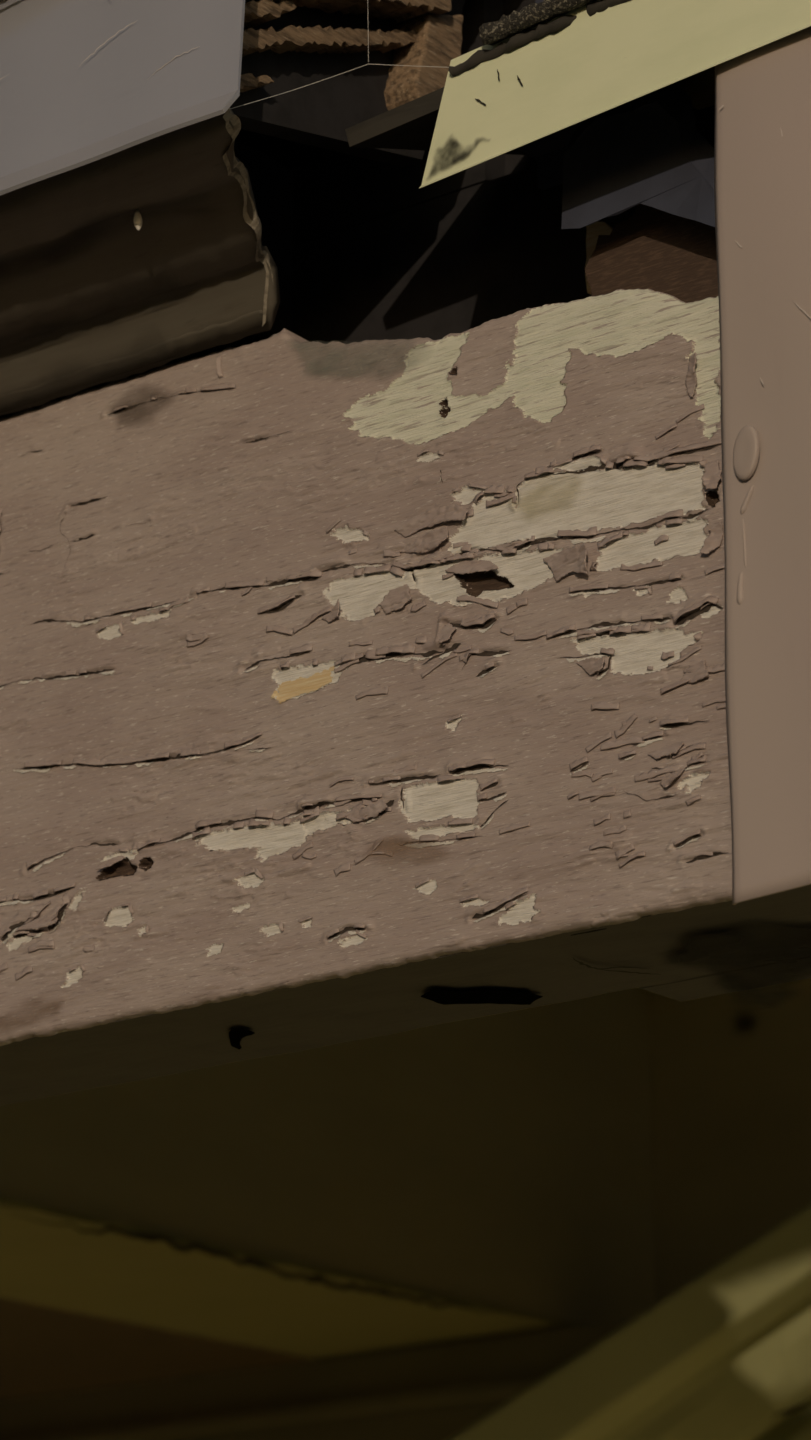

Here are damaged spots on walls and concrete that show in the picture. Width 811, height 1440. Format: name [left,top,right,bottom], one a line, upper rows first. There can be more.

peeling [342,289,721,462]
peeling [322,455,723,621]
peeling [570,585,723,676]
peeling [271,659,352,703]
peeling [398,775,480,839]
peeling [95,847,138,870]
peeling [192,806,369,913]
peeling [6,887,86,951]
peeling [103,903,149,937]
peeling [498,893,540,926]
spalling [421,989,543,1005]
crack [1,1209,504,1313]